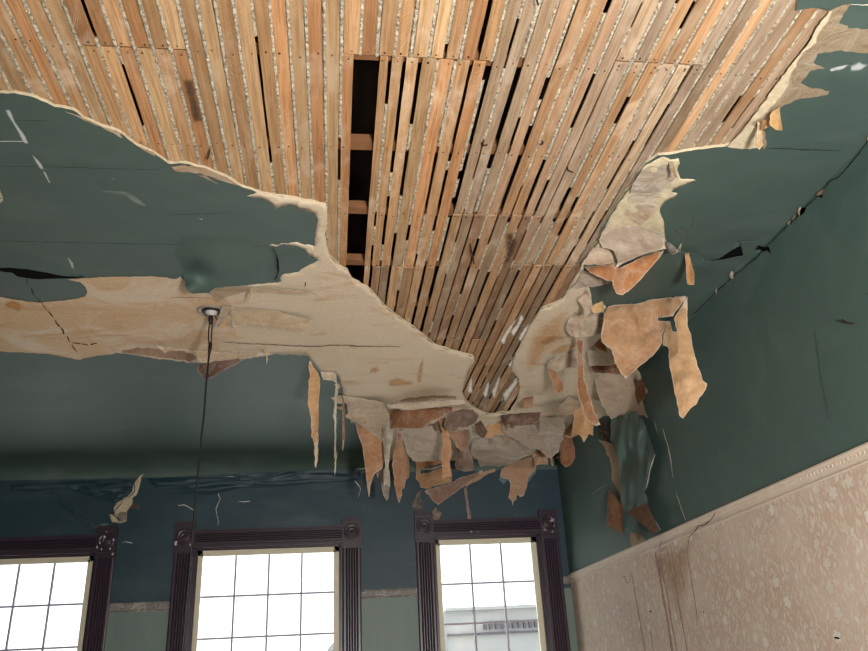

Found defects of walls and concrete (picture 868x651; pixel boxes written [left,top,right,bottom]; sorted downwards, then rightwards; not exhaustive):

flaking render [727,11,832,149]
flaking render [595,157,696,261]
crack [694,136,868,313]
crack [27,281,97,352]
flaking render [0,192,609,461]
flaking render [109,474,143,523]
damp [655,542,698,651]